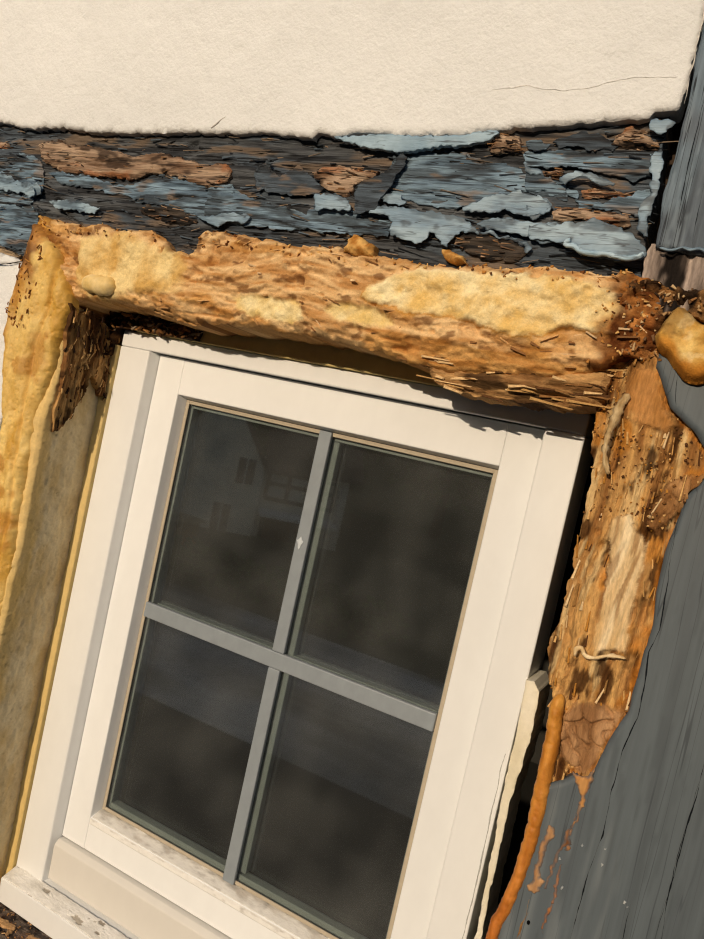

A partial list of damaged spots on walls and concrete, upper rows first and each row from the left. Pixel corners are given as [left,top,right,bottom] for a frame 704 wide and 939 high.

peeling [0,118,676,264]
crack [495,77,651,91]
crack [677,9,704,243]
peeling [3,866,130,939]